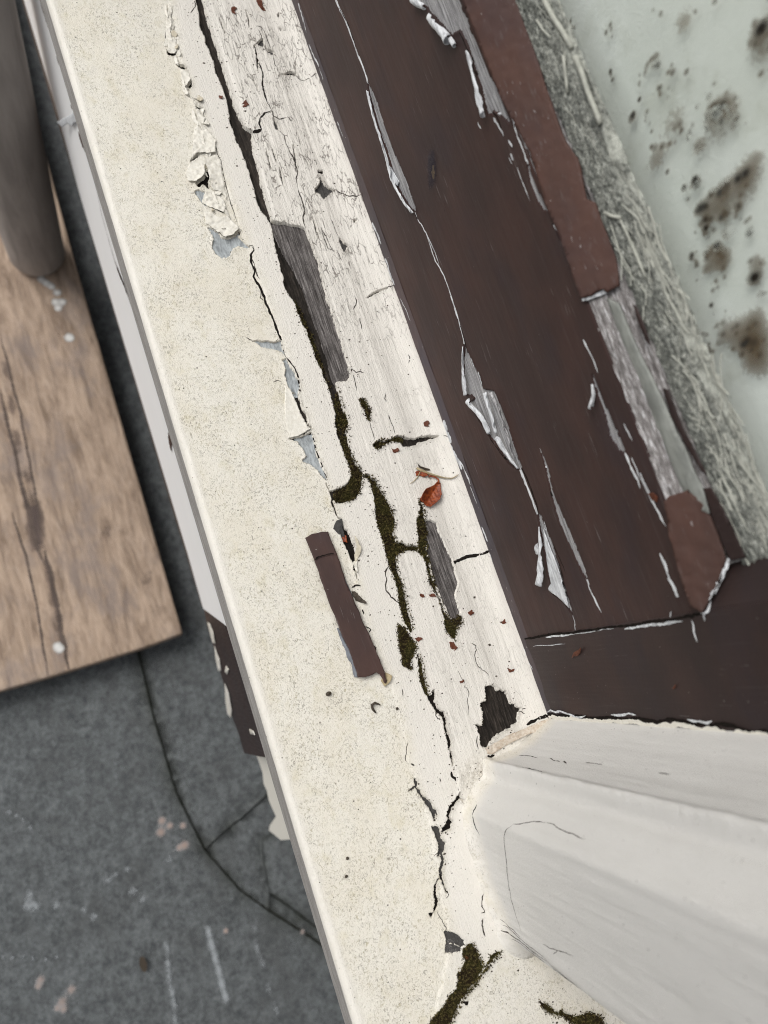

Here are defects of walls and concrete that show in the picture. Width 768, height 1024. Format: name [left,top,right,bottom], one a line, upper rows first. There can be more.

peeling [164,4,249,258]
mould [629,53,739,152]
mould [748,16,768,54]
crack [196,0,447,504]
peeling [335,0,575,627]
mould [681,153,760,308]
mould [702,312,768,369]
peeling [583,340,666,526]
peeling [540,449,601,611]
crack [524,506,733,646]
peeling [660,554,679,597]
crack [402,643,495,930]